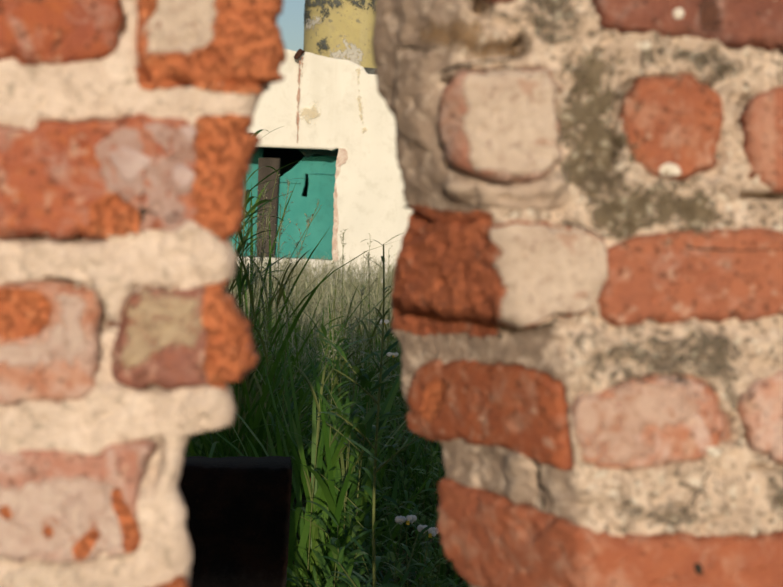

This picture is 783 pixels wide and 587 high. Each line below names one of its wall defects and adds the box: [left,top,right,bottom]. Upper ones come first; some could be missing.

crack [531,457,554,511]